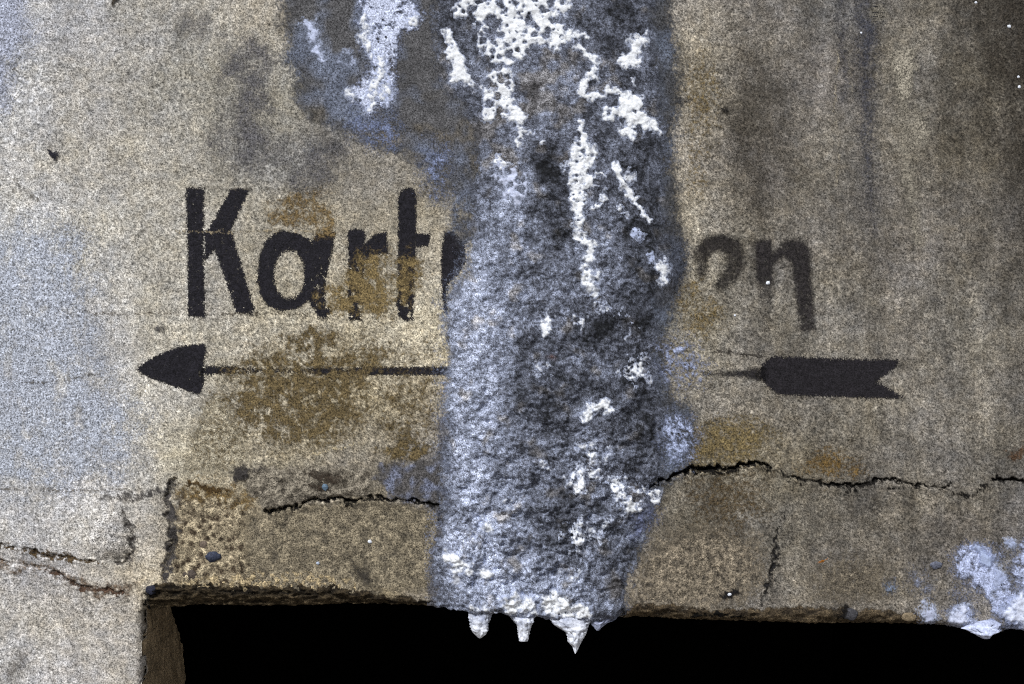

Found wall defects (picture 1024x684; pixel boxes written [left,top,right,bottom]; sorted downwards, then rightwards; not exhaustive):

rust [267,192,336,237]
rust [313,252,426,319]
water stain [208,0,705,654]
rust [209,325,442,461]
crack [263,494,444,520]
crack [652,460,1024,499]
crack [690,512,786,618]
water stain [910,537,1024,639]